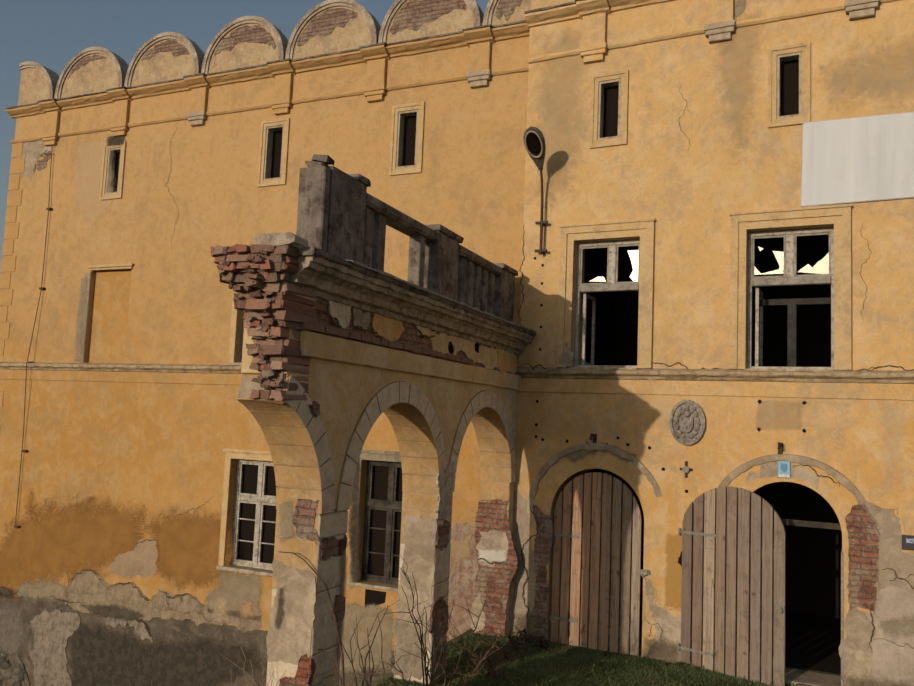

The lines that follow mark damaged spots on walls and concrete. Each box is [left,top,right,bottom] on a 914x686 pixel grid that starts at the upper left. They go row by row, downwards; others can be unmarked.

flaking render [17,140,55,177]
flaking render [293,499,347,561]
damp [0,498,232,654]
flaking render [391,461,554,680]
flaking render [845,501,914,639]
crack [882,568,914,589]
flaking render [0,539,261,686]
flaking render [279,653,316,686]
flaking render [839,637,847,686]
crack [869,610,914,651]